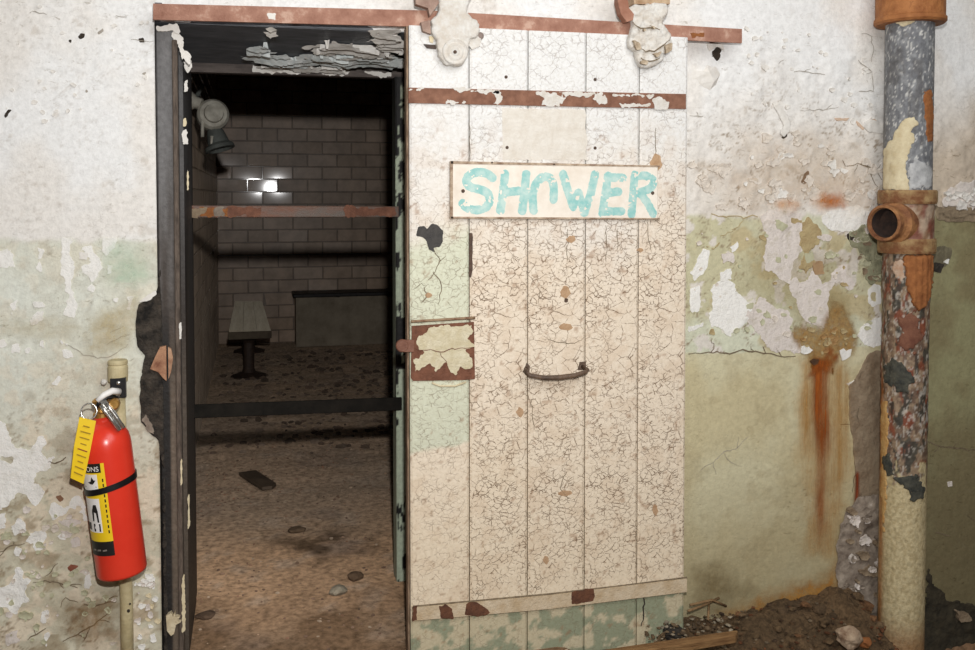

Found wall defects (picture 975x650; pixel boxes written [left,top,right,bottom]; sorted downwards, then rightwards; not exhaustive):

peeling [242,27,405,78]
spalling [706,42,725,61]
peeling [60,238,117,318]
peeling [416,224,443,252]
crack [689,340,796,357]
spalling [687,77,884,621]
corrosion [892,254,934,355]
corrosion [805,350,840,454]
spalling [113,270,168,650]
corrosion [880,401,890,532]
peeling [0,421,117,646]